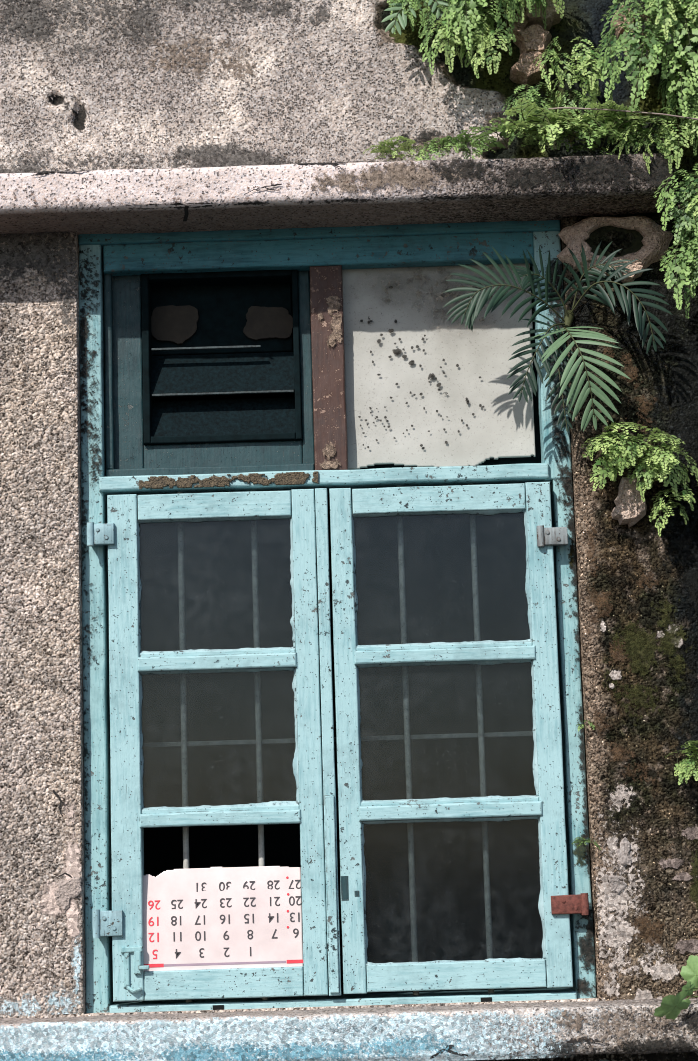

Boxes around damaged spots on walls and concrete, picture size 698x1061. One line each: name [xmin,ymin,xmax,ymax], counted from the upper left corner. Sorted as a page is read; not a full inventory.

flaking render [509,0,563,89]
flaking render [610,5,640,59]
flaking render [49,94,86,132]
damp [311,128,674,197]
flaking render [480,112,512,132]
damp [545,258,601,661]
damp [608,267,698,769]
damp [576,699,590,878]
peeling [0,784,698,1061]